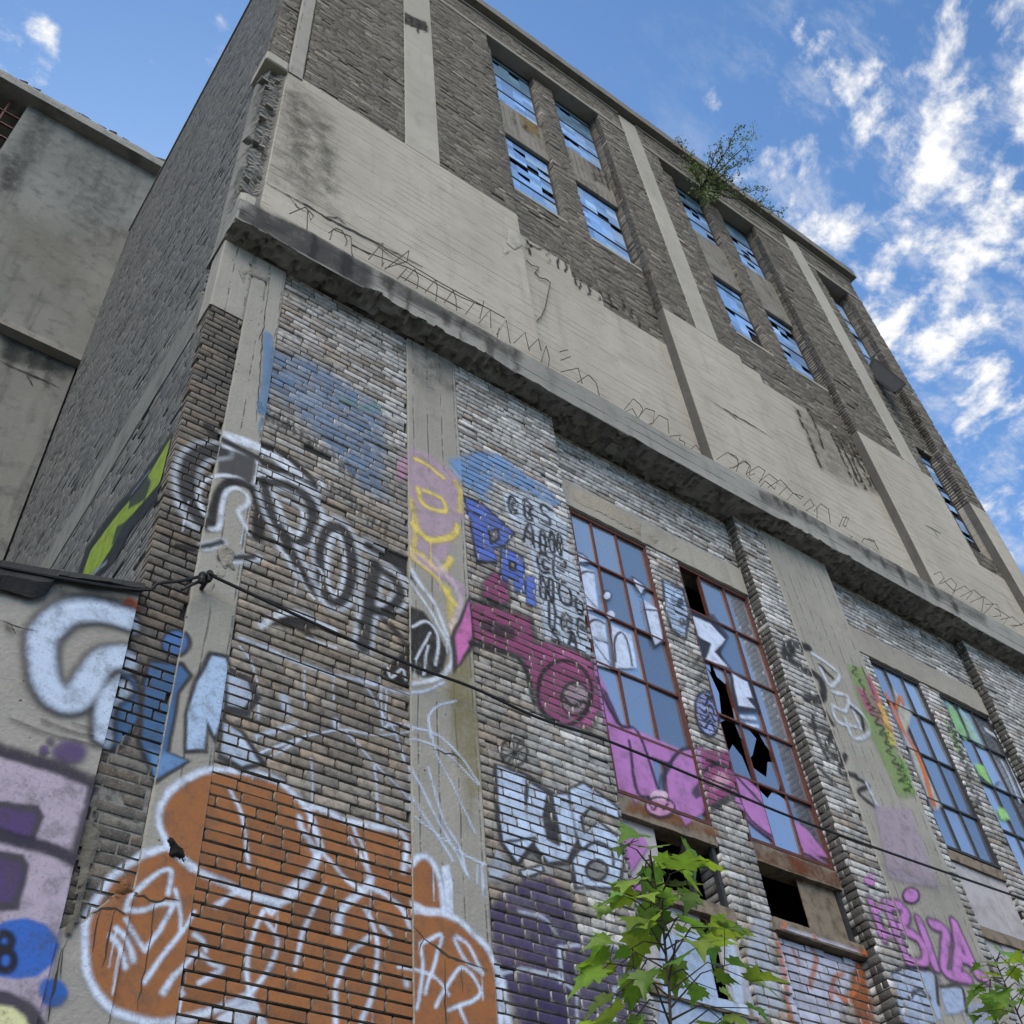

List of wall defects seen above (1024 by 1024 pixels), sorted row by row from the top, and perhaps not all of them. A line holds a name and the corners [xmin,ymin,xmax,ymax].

spalling [214,69,287,248]
crack [91,894,177,1011]